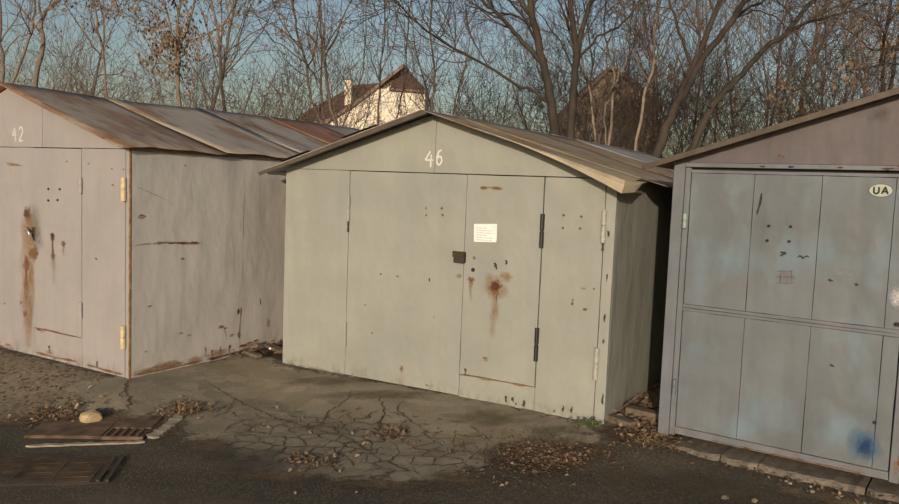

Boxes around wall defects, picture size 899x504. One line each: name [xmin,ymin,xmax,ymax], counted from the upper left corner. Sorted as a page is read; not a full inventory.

corrosion [21,209,38,322]
corrosion [137,307,242,375]
corrosion [488,274,509,315]
crack [207,381,498,481]